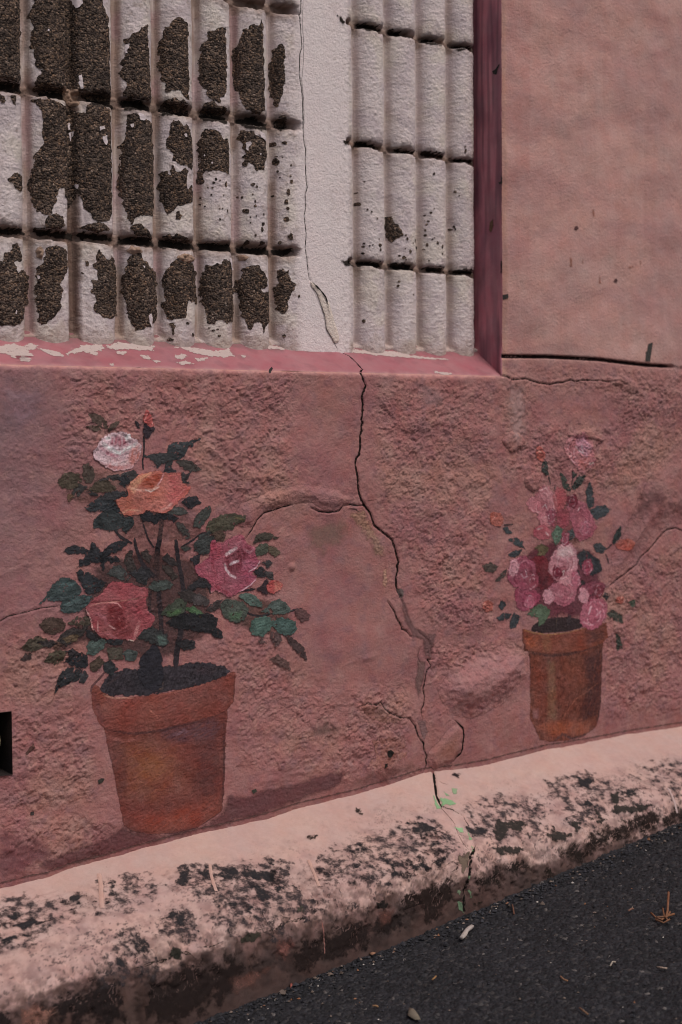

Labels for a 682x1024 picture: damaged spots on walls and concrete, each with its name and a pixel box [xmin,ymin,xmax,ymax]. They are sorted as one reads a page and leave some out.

peeling [0,0,293,246]
peeling [0,243,300,366]
crack [298,1,410,636]
peeling [352,348,452,376]
crack [505,376,608,385]
crack [246,504,291,538]
water stain [466,760,682,844]
water stain [315,816,455,886]
water stain [0,857,358,952]
water stain [96,928,159,989]